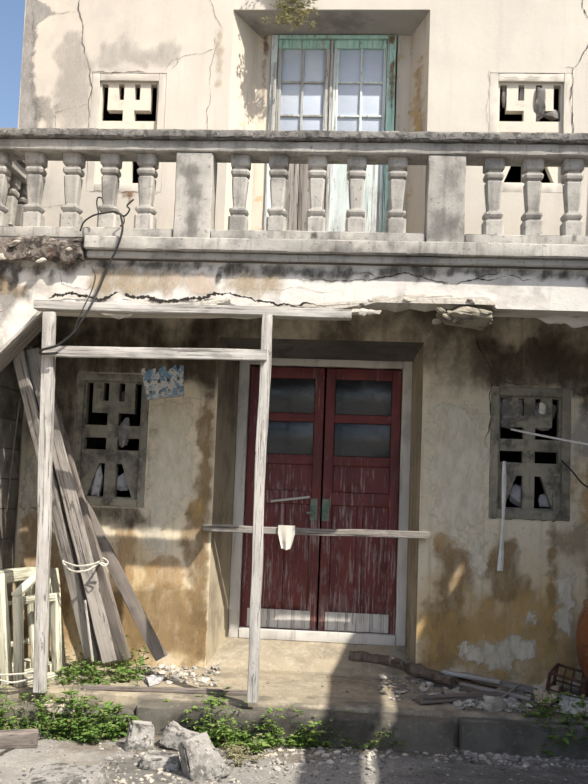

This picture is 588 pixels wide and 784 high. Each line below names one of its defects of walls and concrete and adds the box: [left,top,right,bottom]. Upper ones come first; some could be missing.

crack [55,2,143,128]
crack [169,0,223,130]
crack [486,46,588,133]
spalling [0,235,85,264]
water stain [90,260,200,292]
water stain [216,263,354,293]
crack [49,272,528,307]
spalling [261,294,496,331]
water stain [136,395,213,658]
water stain [423,476,588,680]
water stain [113,591,144,660]
peeling [458,635,536,671]